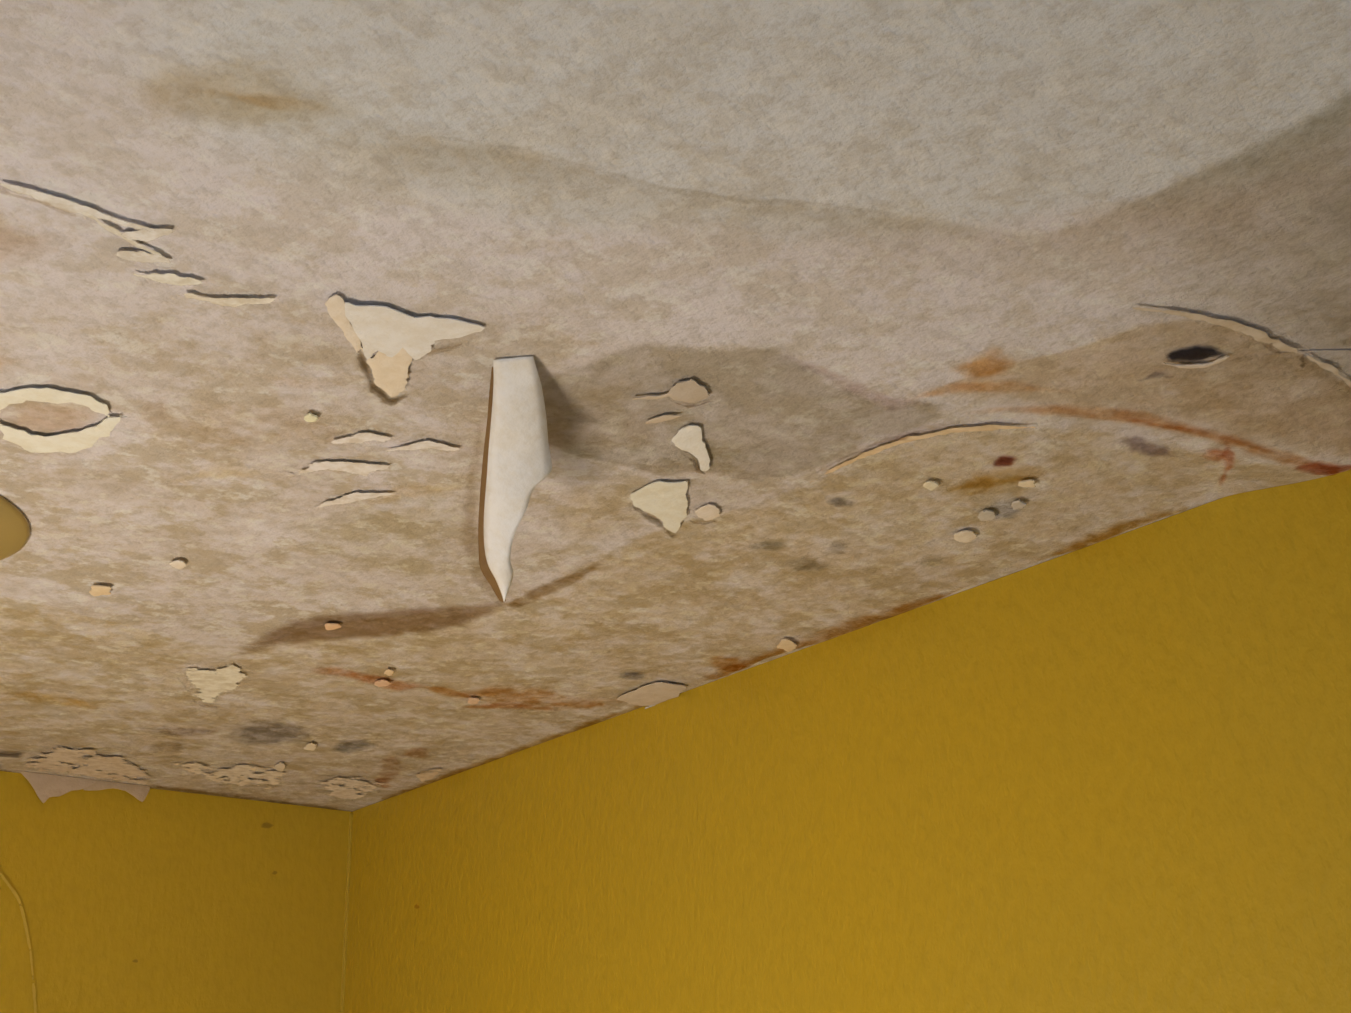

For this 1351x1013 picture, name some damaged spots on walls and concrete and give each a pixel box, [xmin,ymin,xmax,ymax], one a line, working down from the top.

peeling [325,294,485,405]
peeling [632,379,710,472]
peeling [478,356,552,602]
peeling [630,481,720,533]
peeling [185,662,247,705]
peeling [0,745,154,803]